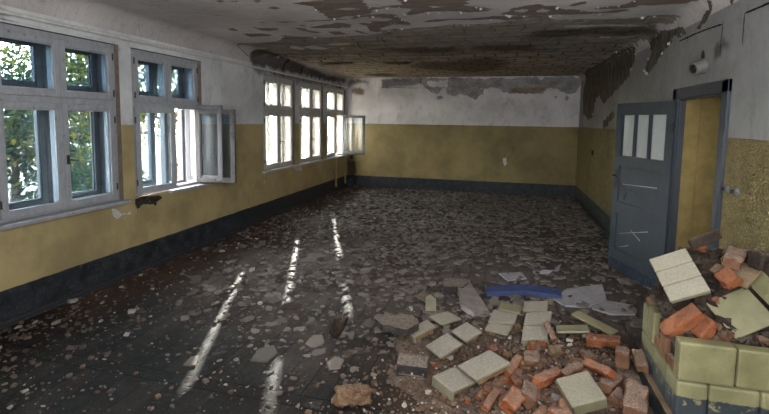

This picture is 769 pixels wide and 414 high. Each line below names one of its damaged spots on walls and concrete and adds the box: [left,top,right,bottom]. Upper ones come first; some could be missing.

peeling [229,0,713,128]
peeling [111,195,163,220]